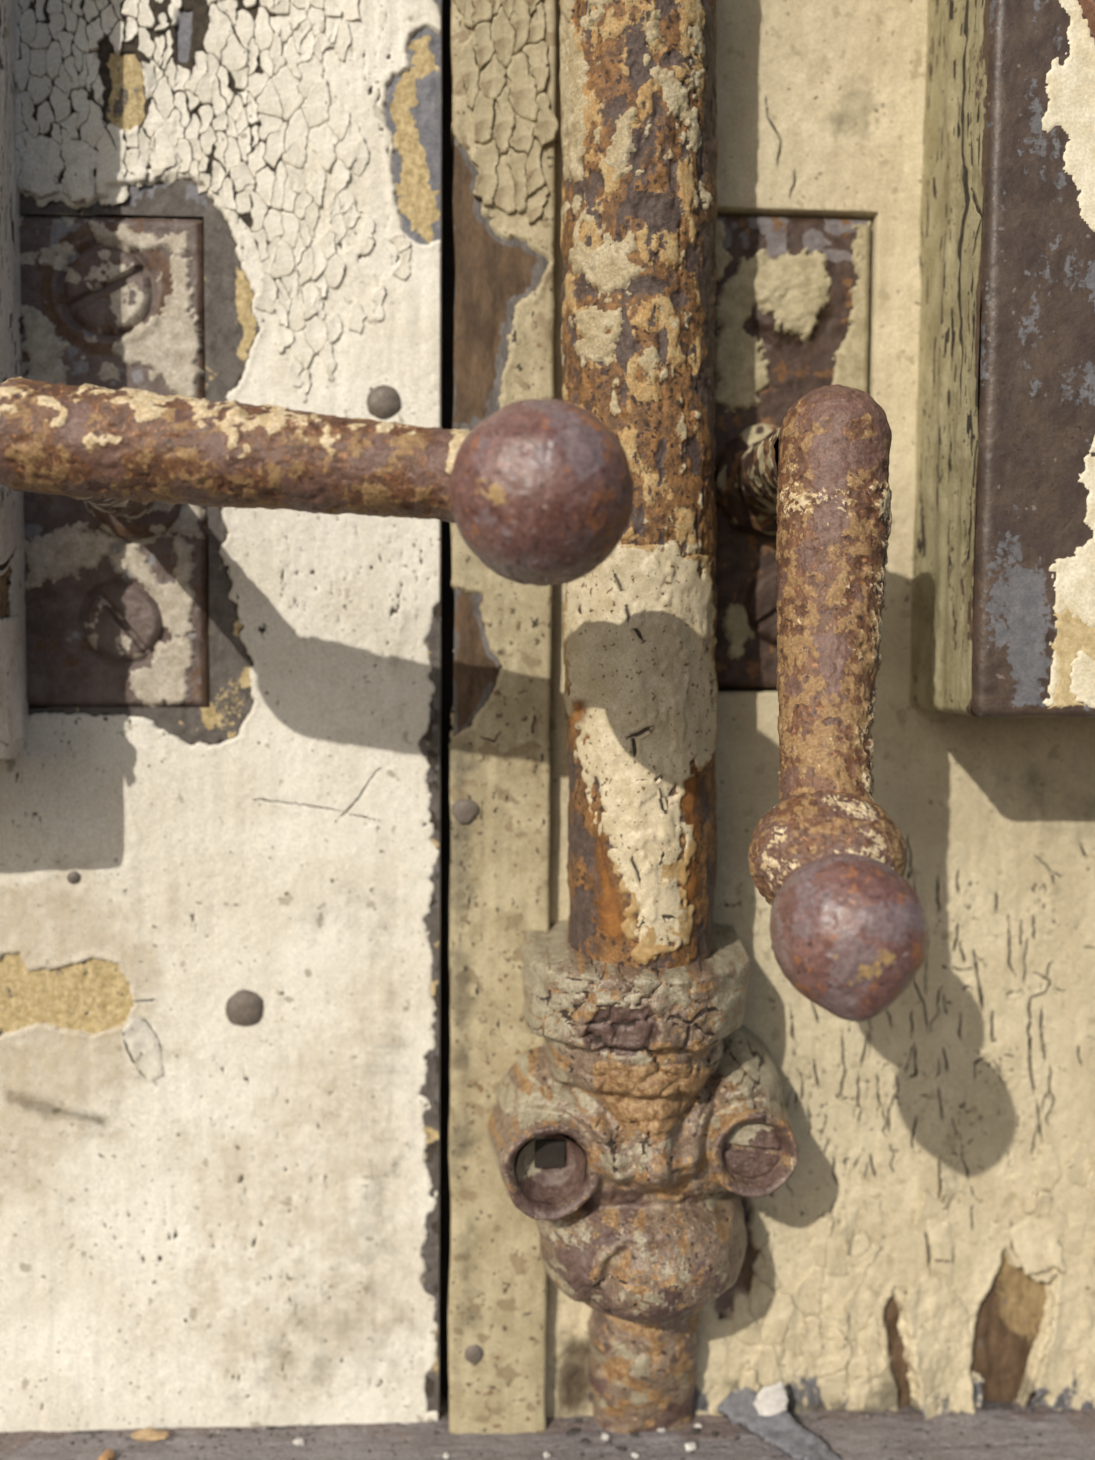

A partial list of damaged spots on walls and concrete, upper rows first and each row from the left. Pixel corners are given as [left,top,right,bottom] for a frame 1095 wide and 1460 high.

crack [4,0,412,403]
peeling [384,27,549,431]
crack [453,0,559,225]
peeling [1042,0,1095,232]
peeling [1043,436,1095,709]
corrosion [572,701,583,722]
corrosion [596,839,624,939]
peeling [563,540,718,964]
corrosion [681,768,698,901]
crack [731,833,1095,1413]
corrosion [558,1340,592,1411]
peeling [884,1160,1095,1420]